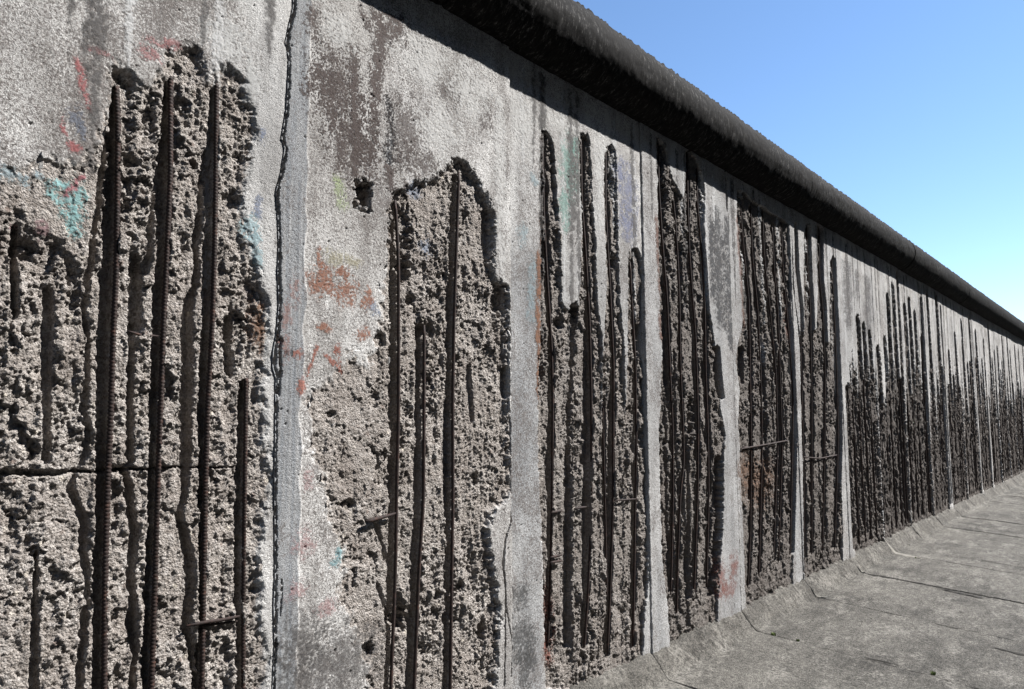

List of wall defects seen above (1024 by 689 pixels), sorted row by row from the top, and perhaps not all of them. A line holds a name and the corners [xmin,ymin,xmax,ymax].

crack [0,465,232,476]
spalling [0,39,273,689]
crack [273,0,297,689]
spalling [298,157,511,689]
spalling [537,129,649,689]
rust [709,554,738,601]
spalling [656,135,1024,641]